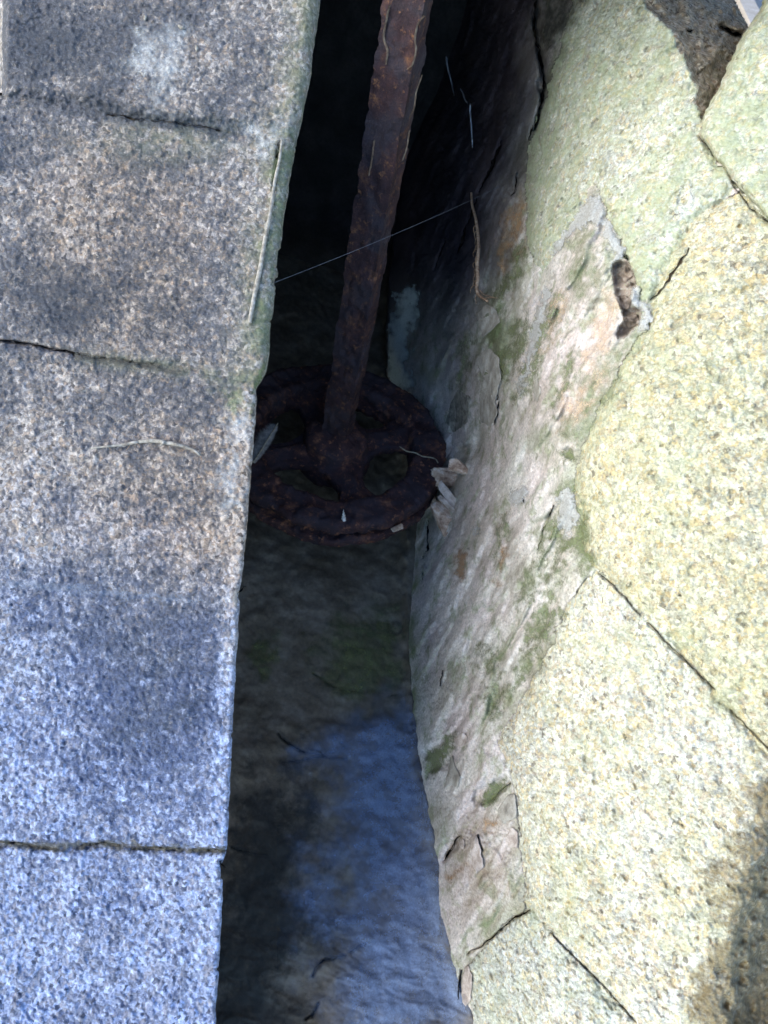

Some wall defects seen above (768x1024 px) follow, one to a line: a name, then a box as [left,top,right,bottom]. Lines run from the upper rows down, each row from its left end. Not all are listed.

crack [108,114,220,131]
spalling [611,259,642,339]
crack [0,340,153,365]
crack [600,574,715,690]
crack [82,842,242,868]
crack [550,932,632,1017]